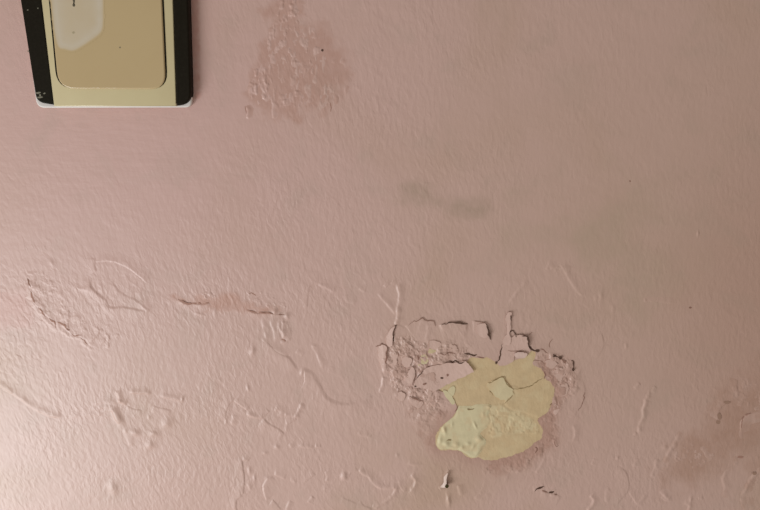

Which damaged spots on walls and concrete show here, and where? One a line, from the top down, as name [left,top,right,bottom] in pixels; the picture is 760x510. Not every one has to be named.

water stain [239,0,359,130]
crack [23,256,121,353]
crack [167,289,292,359]
peeling [372,307,590,510]